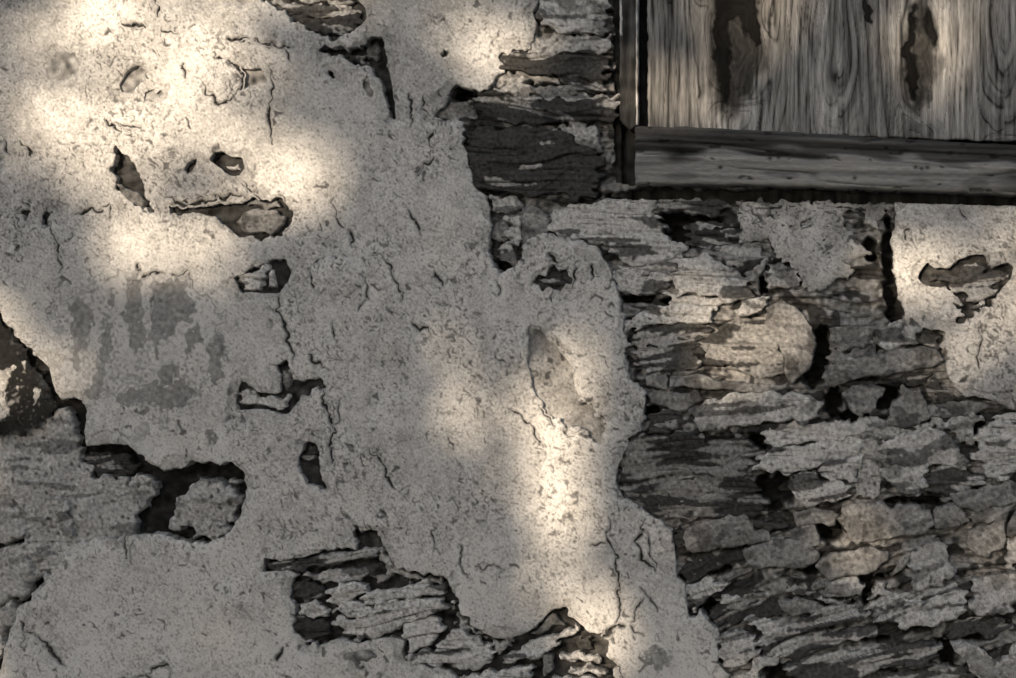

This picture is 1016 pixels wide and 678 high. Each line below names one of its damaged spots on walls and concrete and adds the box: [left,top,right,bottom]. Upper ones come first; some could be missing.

spalling [264,0,396,120]
crack [0,140,34,158]
spalling [114,149,154,211]
spalling [172,197,293,241]
spalling [237,259,292,293]
spalling [437,0,1016,678]
spalling [237,360,326,414]
spalling [0,313,247,670]
spalling [266,528,617,678]
crack [589,517,659,639]
crack [19,620,66,667]
crack [120,662,173,678]